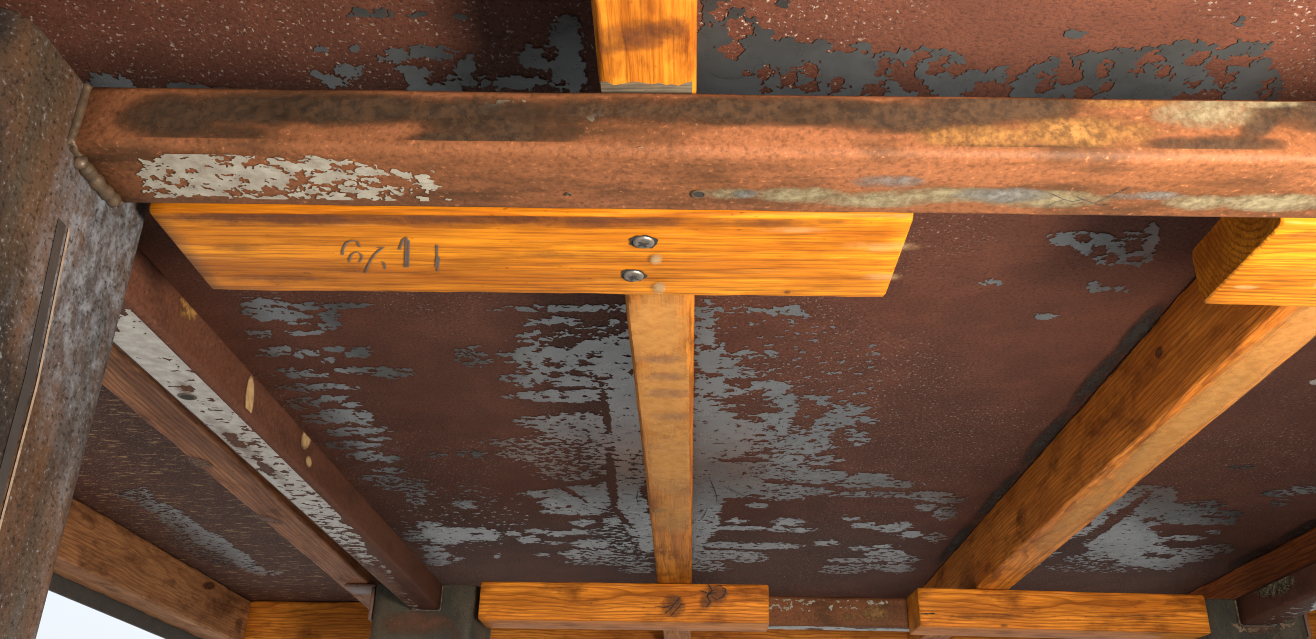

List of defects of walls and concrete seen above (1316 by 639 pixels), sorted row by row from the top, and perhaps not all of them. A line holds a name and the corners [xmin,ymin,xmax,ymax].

peeling [347,7,427,19]
peeling [310,14,587,102]
peeling [696,0,1286,101]
corrosion [118,94,1316,150]
peeling [136,143,451,201]
peeling [113,309,419,610]
peeling [240,297,655,574]
peeling [692,299,968,575]
peeling [1039,484,1248,573]
peeling [1232,602,1316,632]